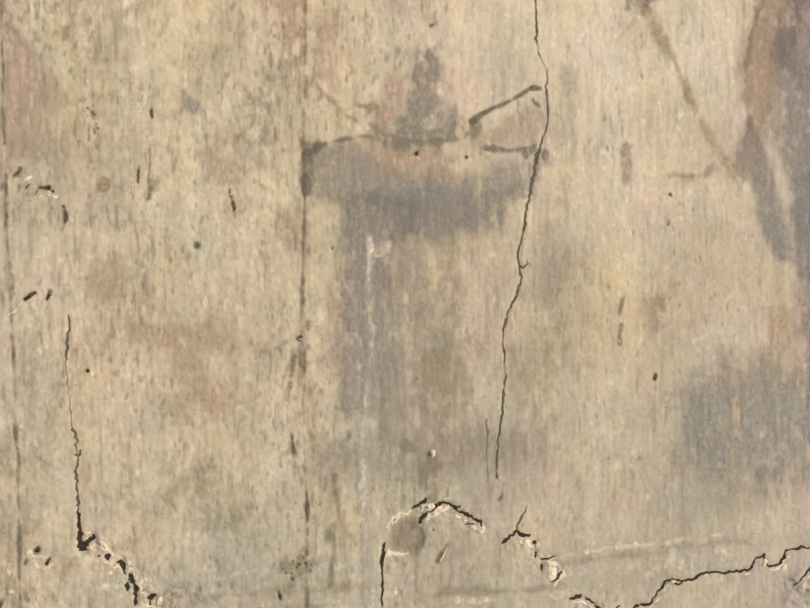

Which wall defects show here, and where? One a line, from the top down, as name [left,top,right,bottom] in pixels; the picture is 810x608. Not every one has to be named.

crack [486,0,549,502]
crack [65,314,175,608]
spalling [385,510,424,556]
crack [380,497,810,608]
spalling [782,562,810,607]